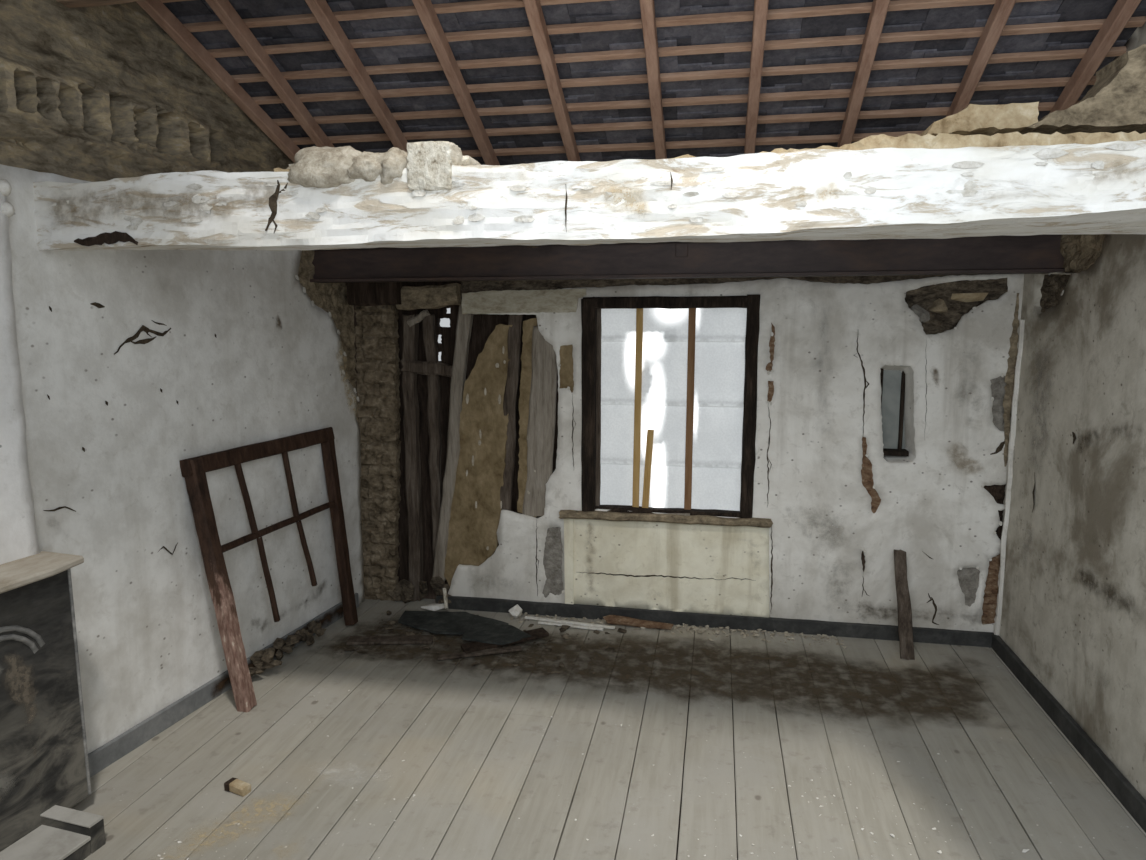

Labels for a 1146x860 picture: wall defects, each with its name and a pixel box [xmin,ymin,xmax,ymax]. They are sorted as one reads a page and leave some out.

crack [114,320,171,355]
spalling [905,292,1006,336]
crack [854,337,869,434]
spalling [990,373,1012,431]
crack [580,407,773,609]
spalling [861,437,881,513]
spalling [542,527,565,599]
spalling [957,484,1006,629]